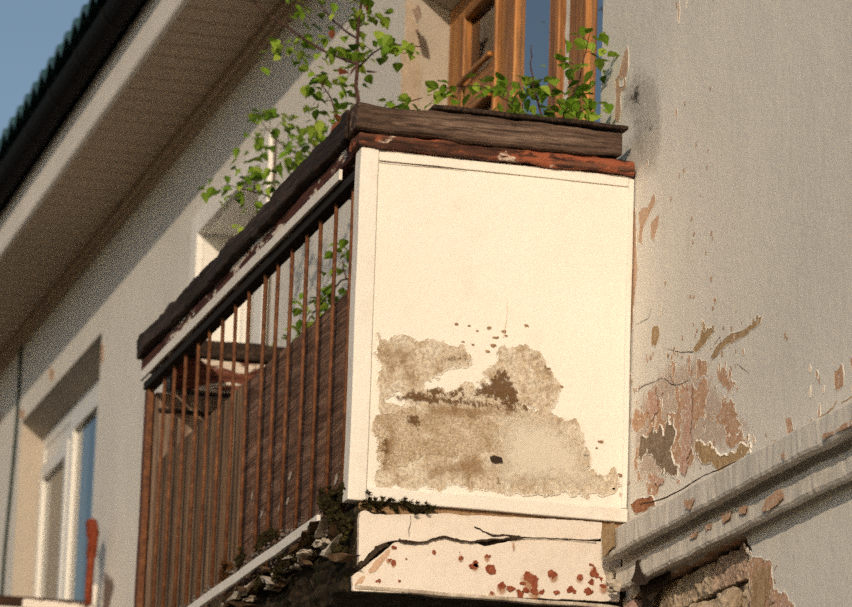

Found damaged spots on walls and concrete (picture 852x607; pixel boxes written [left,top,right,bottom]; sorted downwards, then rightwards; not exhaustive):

peeling [614,45,629,123]
peeling [631,191,671,331]
peeling [646,303,663,363]
peeling [618,319,766,515]
crack [637,315,763,392]
peeling [809,357,852,422]
crack [818,396,852,418]
crack [640,461,736,505]
crack [355,516,596,570]
spalling [601,522,796,607]